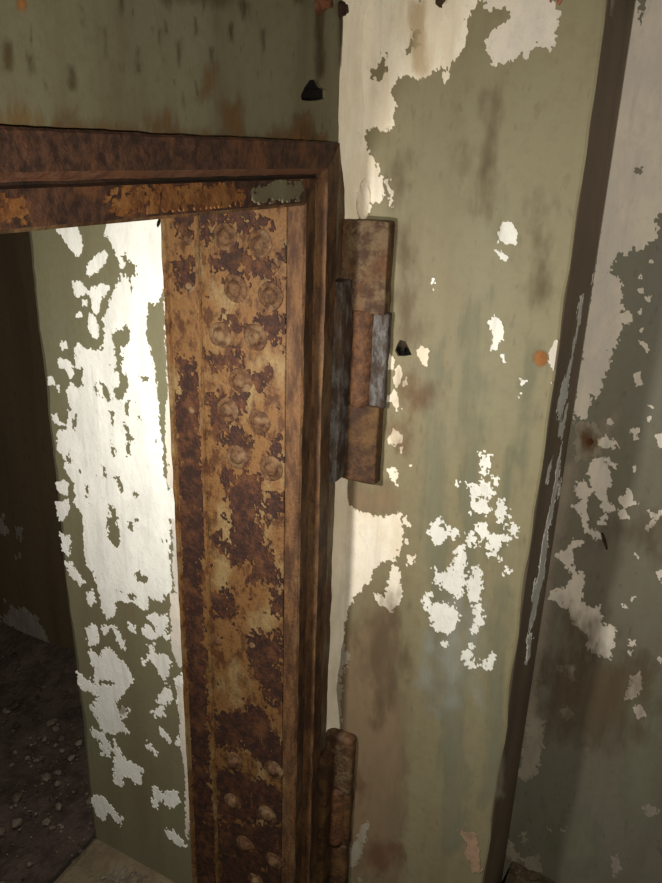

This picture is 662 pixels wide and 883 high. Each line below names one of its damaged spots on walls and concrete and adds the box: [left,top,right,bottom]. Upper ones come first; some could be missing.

corrosion [0,193,29,225]
corrosion [103,181,287,295]
peeling [387,353,408,412]
peeling [416,346,430,367]
peeling [356,0,562,220]
peeling [487,314,506,363]
peeling [494,221,518,262]
peeling [525,0,662,665]
peeling [48,219,190,848]
corrosion [174,308,286,883]
peeling [336,499,417,723]
peeling [420,450,520,671]